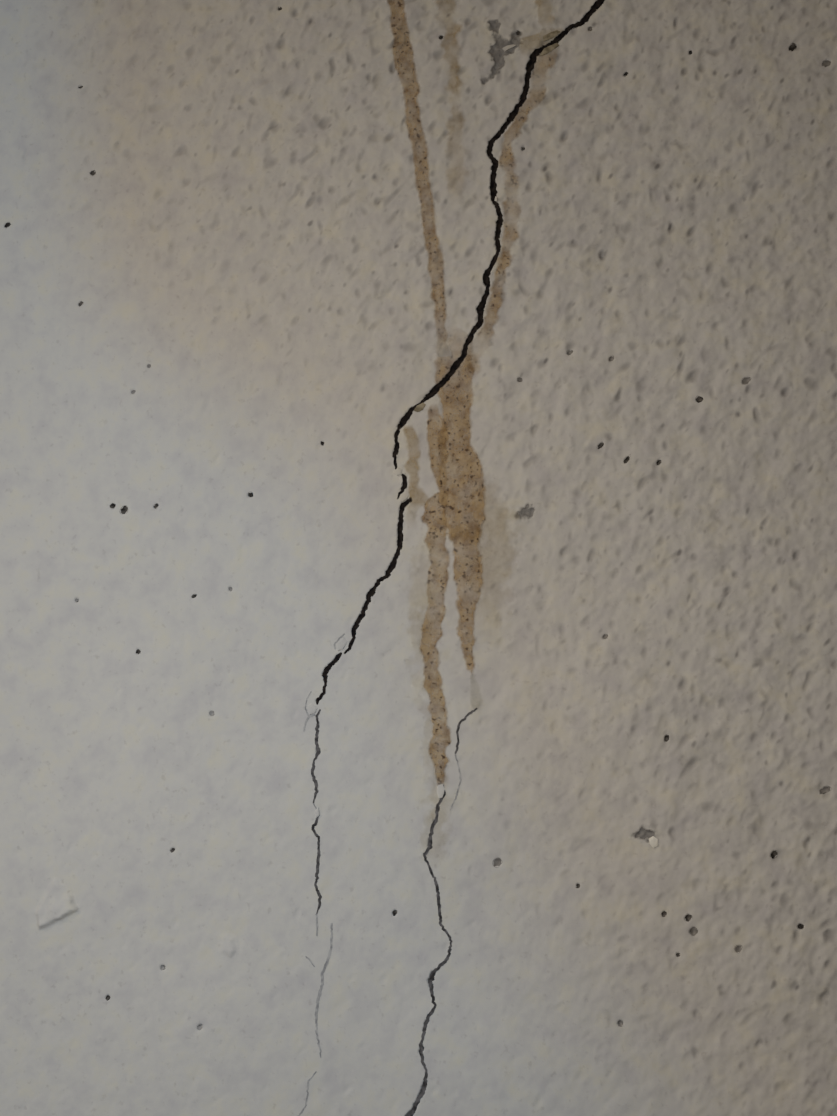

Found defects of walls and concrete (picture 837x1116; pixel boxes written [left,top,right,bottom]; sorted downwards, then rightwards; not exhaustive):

corrosion [389,0,445,321]
corrosion [405,361,485,783]
crack [298,0,605,1116]